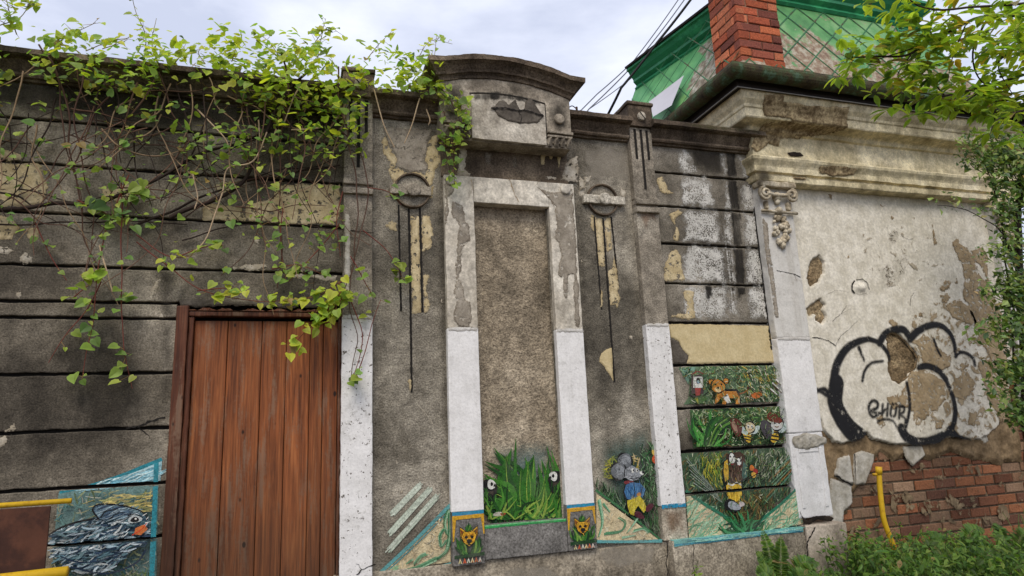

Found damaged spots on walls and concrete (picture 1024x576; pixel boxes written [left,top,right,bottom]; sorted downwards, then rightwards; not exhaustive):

peeling [381,127,472,327]
peeling [541,155,591,327]
peeling [590,215,620,308]
peeling [657,177,673,194]
peeling [664,209,779,364]
flaking render [751,94,850,157]
flaking render [792,204,1024,537]